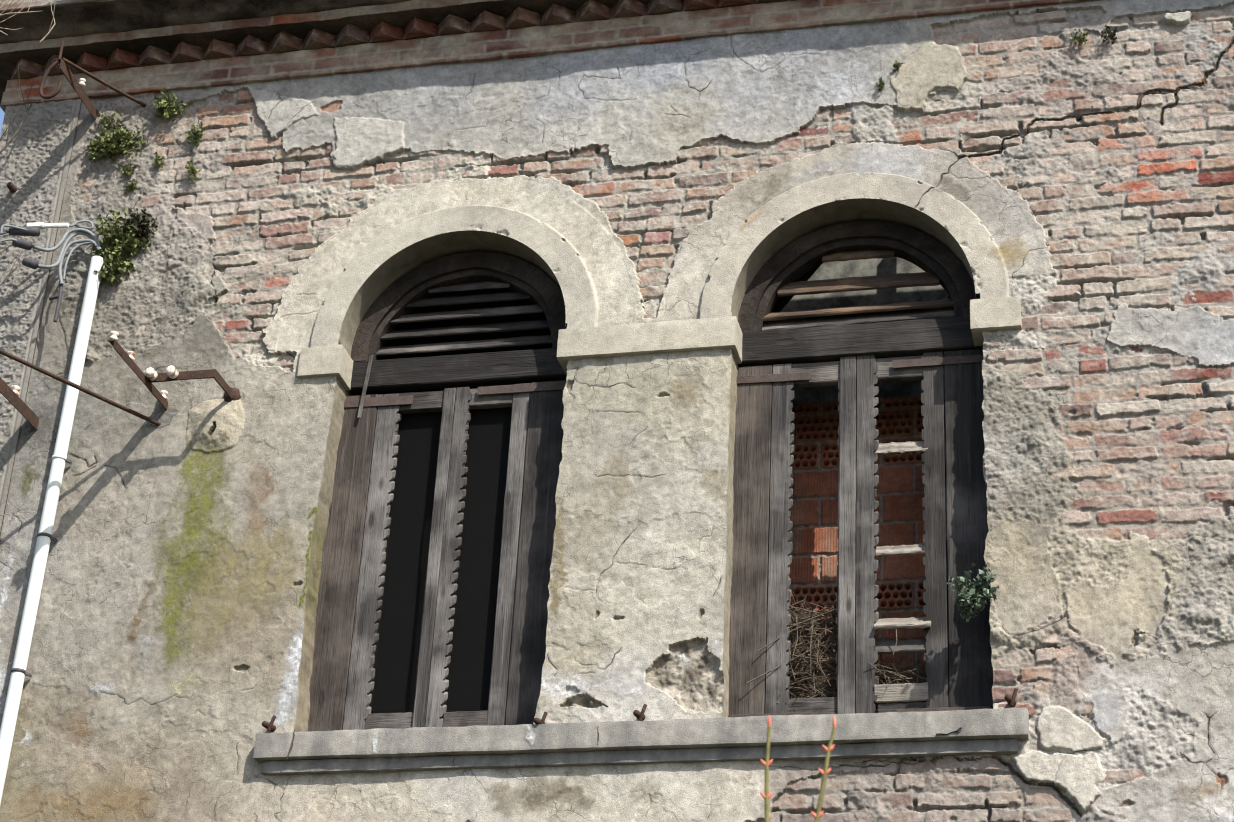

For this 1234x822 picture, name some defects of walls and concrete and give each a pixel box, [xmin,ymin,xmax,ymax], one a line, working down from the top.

crack [915,36,1234,207]
flaking render [160,1,1234,541]
crack [567,367,646,441]
crack [569,525,684,601]
flaking render [560,689,608,708]
flaking render [646,637,724,713]
flaking render [745,643,1108,822]
flaking render [1131,627,1140,648]
flaking render [1215,772,1231,788]